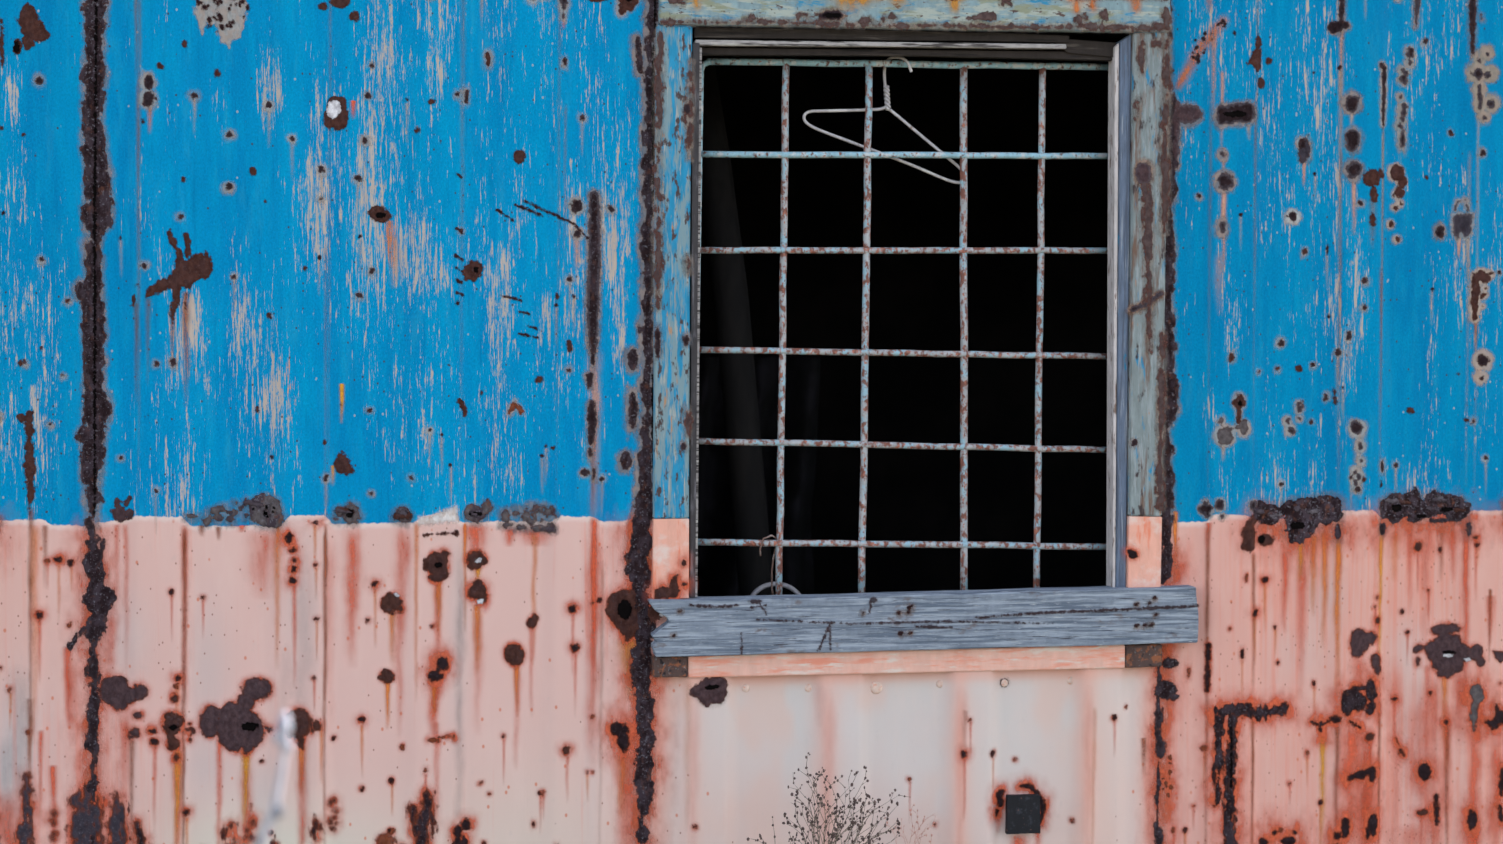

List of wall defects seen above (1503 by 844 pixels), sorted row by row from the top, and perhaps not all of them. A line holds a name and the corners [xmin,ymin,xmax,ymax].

peeling [182,0,249,49]
rust [1465,0,1501,124]
rust [132,228,213,338]
rust [1433,197,1495,385]
rust [0,410,46,533]
rust [110,495,134,522]
rust [1282,400,1304,437]
rust [0,520,339,844]
rust [690,677,728,707]
rust [1142,498,1503,844]
rust [376,768,486,844]
rust [992,779,1050,844]